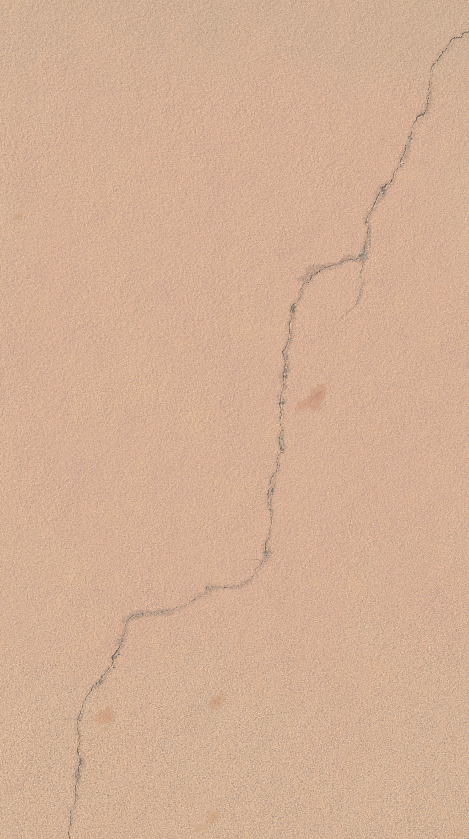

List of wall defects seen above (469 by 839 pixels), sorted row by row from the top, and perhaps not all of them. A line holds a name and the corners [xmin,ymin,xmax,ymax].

crack [291,31,469,321]
crack [67,305,295,839]